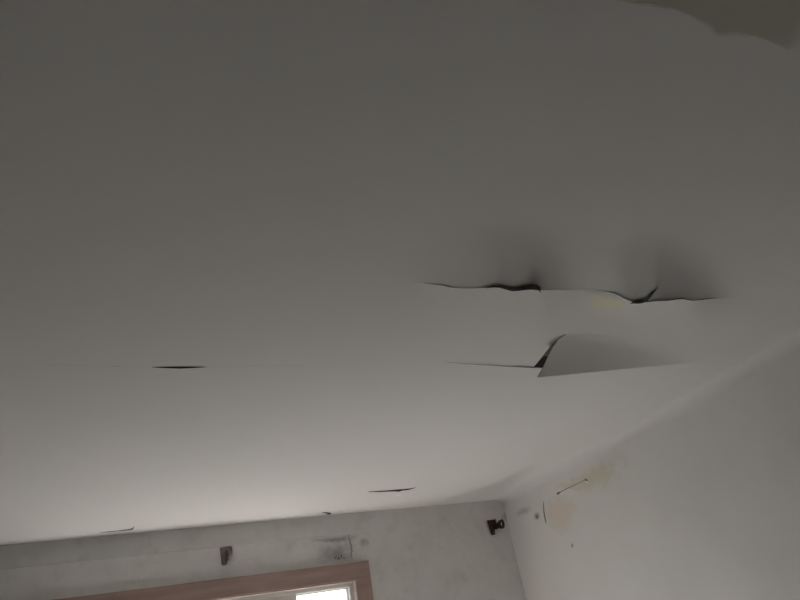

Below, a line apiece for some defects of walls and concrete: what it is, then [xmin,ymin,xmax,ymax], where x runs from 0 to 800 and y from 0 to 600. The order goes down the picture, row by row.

crack [480,285,541,293]
crack [609,288,716,304]
peeling [400,282,740,378]
crack [40,362,202,370]
crack [451,361,535,369]
crack [370,487,416,496]
crack [543,479,588,522]